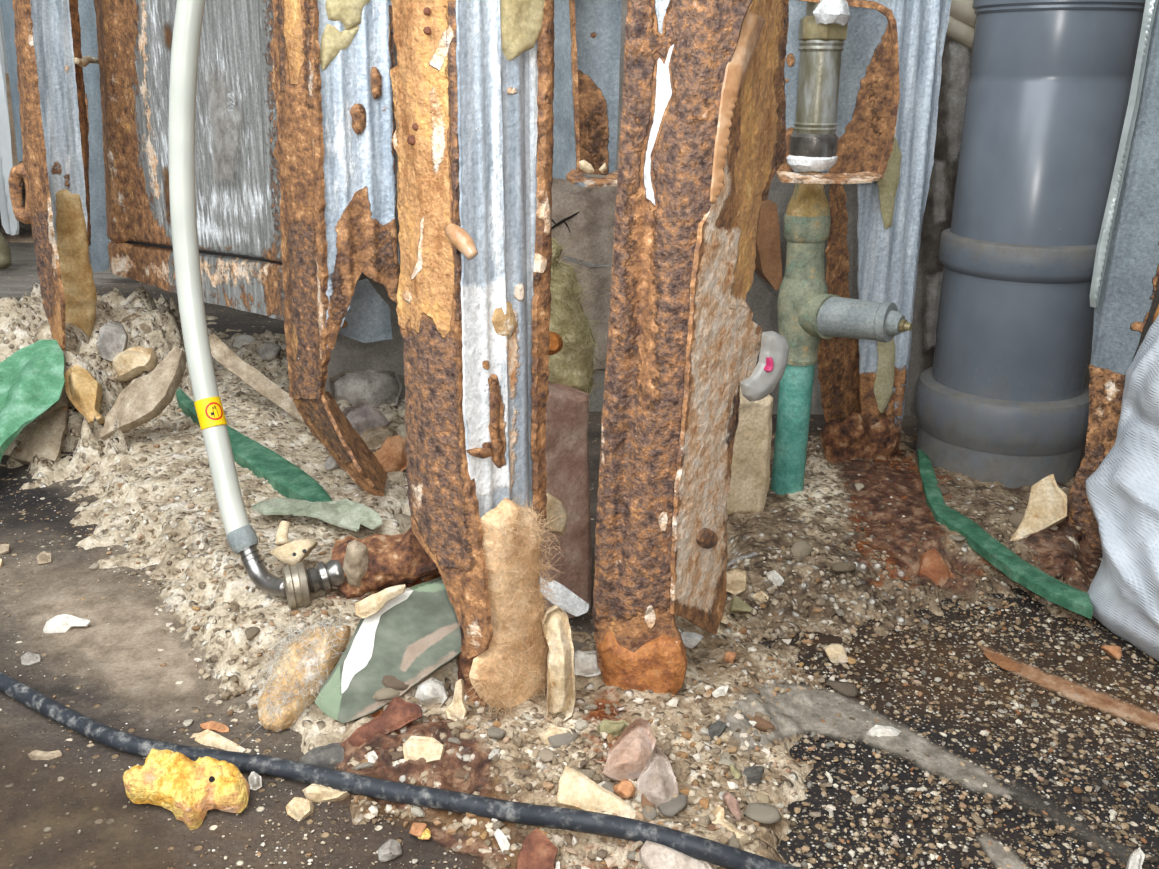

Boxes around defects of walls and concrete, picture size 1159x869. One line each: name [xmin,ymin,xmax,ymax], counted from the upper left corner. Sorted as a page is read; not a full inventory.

rust [163,23,173,48]
rust [350,67,382,135]
peeling [710,10,765,204]
rust [8,163,31,224]
rust [162,166,170,223]
rust [593,0,753,674]
rust [840,454,978,592]
rust [1023,503,1100,590]